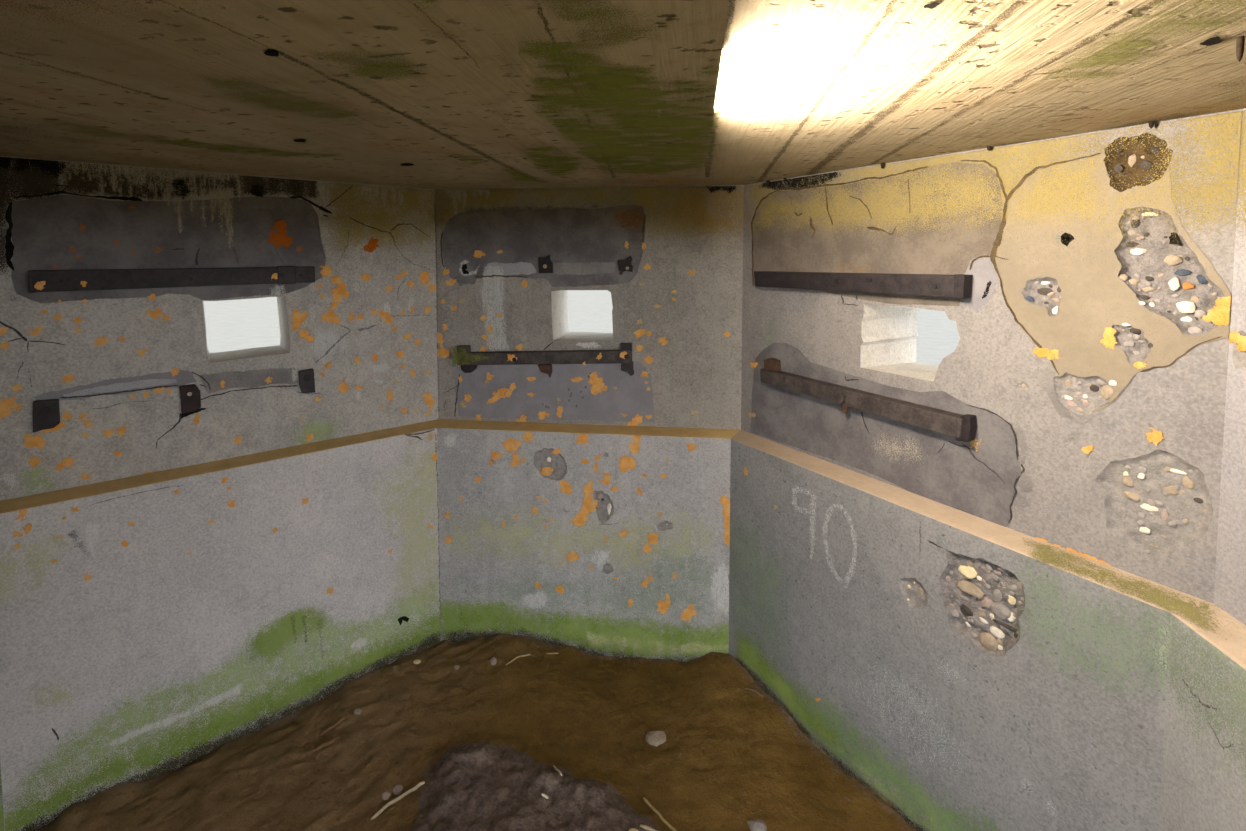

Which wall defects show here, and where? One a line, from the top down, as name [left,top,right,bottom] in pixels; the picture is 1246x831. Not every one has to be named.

water stain [0,62,1246,277]
spalling [1104,133,1173,192]
crack [475,272,526,280]
spalling [1060,233,1074,248]
spalling [1114,207,1225,336]
crack [0,185,460,626]
spalling [1109,323,1153,365]
spalling [1095,449,1213,560]
spalling [896,548,1025,657]
water stain [15,627,703,831]
water stain [733,651,925,831]
water stain [823,654,993,796]